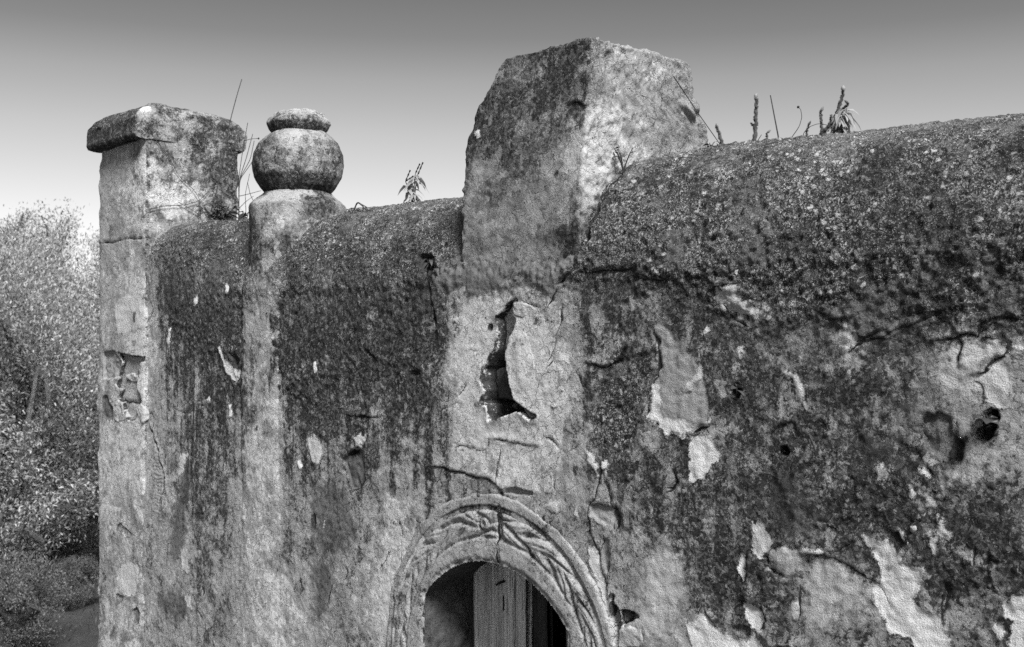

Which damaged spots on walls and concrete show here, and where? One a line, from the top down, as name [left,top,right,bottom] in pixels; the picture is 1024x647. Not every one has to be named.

spalling [102,350,150,424]
flaking render [496,367,536,418]
flaking render [513,302,538,324]
flaking render [644,322,721,483]
crack [848,307,1024,395]
crack [432,436,580,563]
flaking render [790,485,953,647]